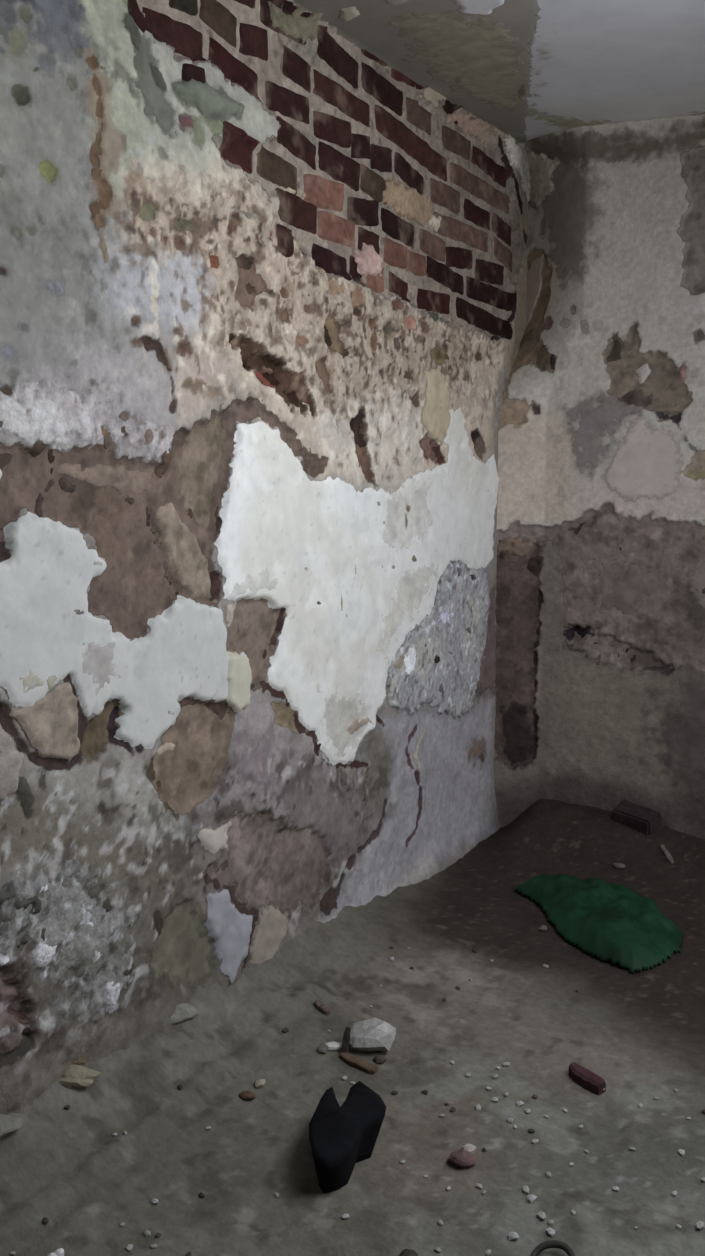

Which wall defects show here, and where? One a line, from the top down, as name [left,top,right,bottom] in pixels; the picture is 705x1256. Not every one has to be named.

crack [260,681,426,915]
flaking render [0,0,705,819]